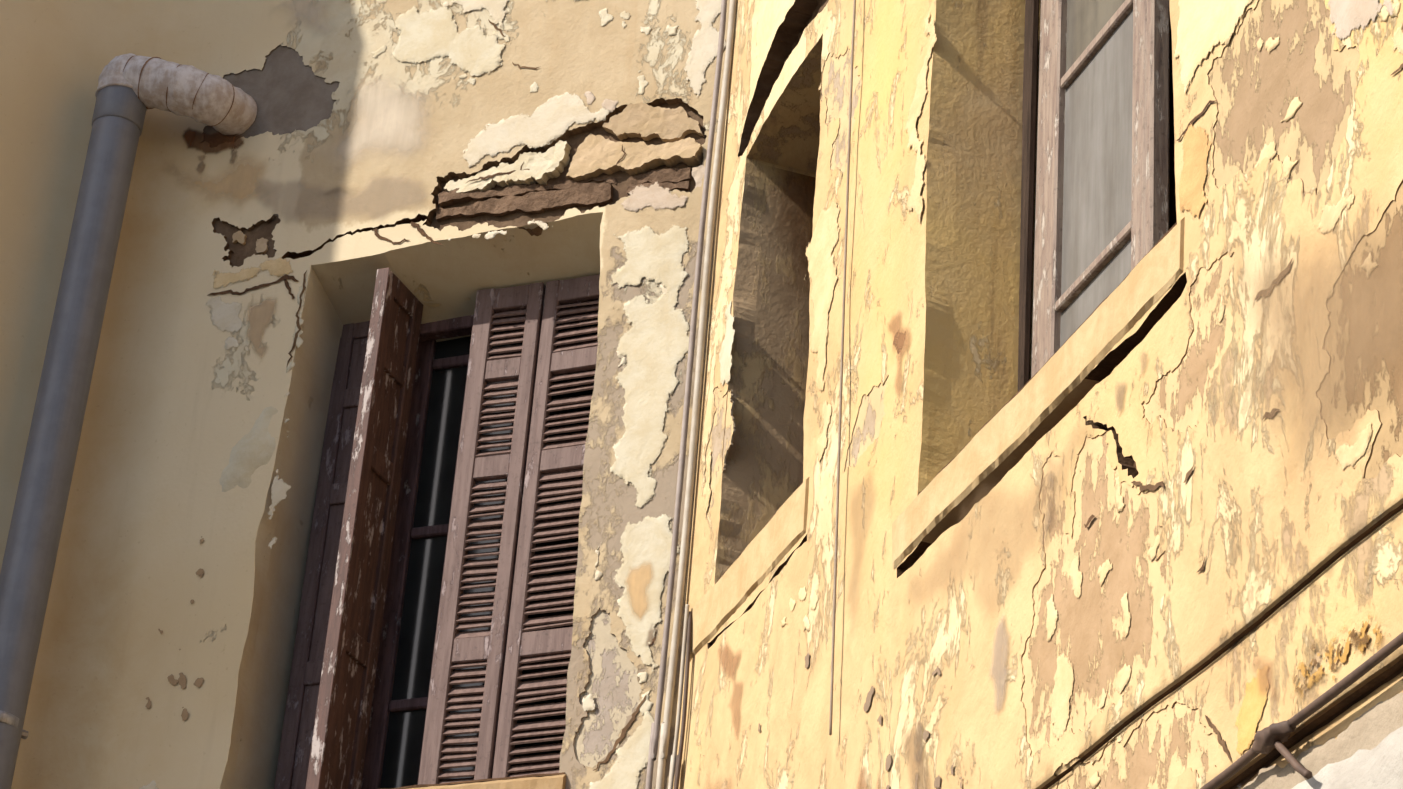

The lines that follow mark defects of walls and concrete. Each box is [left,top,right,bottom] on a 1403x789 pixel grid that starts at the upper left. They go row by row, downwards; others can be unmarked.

peeling [463,82,618,169]
spalling [1174,0,1403,234]
crack [208,214,443,366]
peeling [573,181,690,789]
spalling [703,299,735,518]
peeling [804,201,840,462]
crack [897,541,932,578]
spalling [1021,431,1169,757]
crack [1084,272,1187,382]
crack [1083,416,1194,496]
spalling [1316,180,1403,479]
flaking render [1242,692,1403,789]